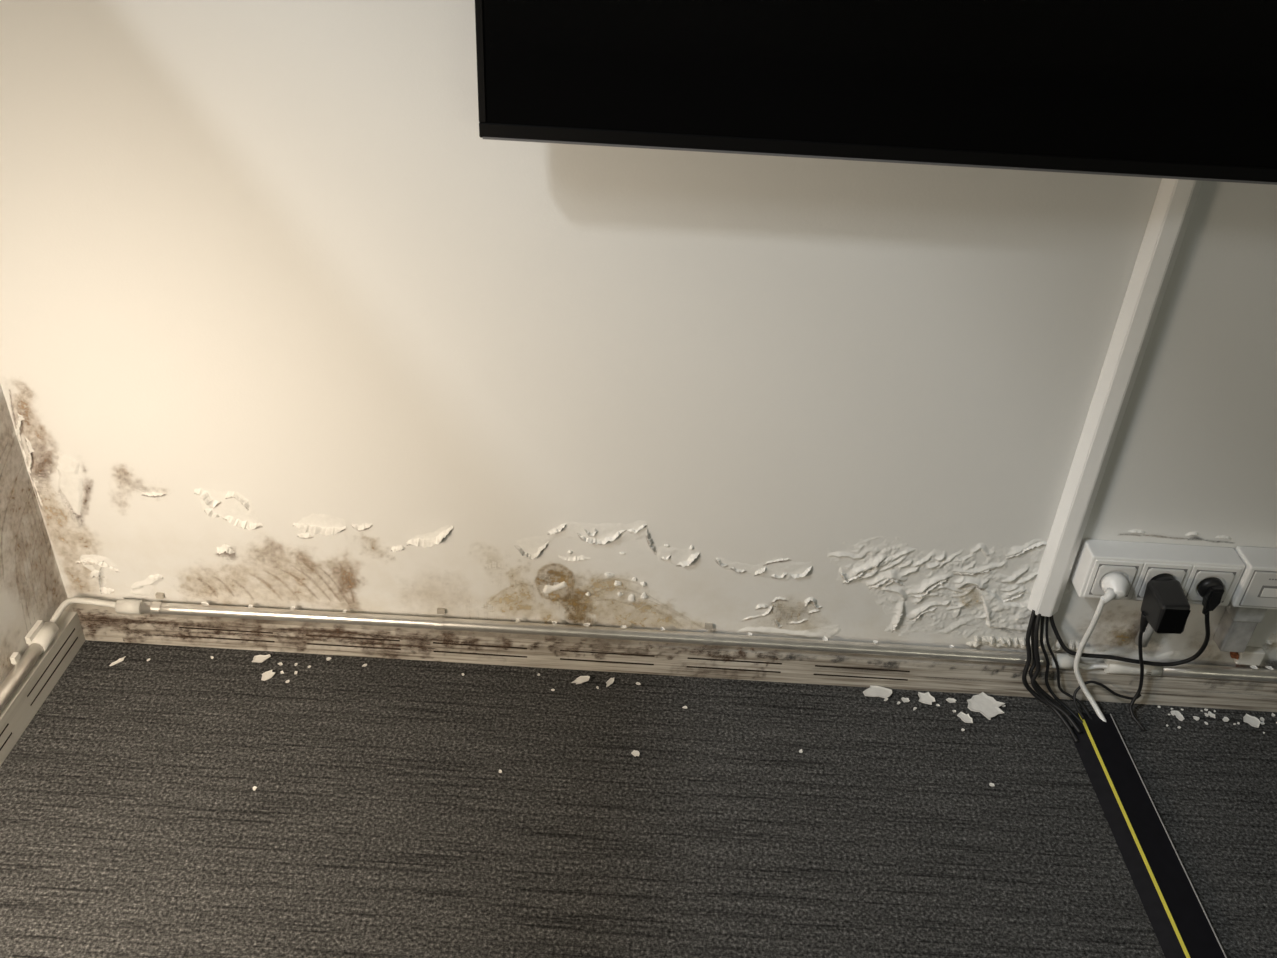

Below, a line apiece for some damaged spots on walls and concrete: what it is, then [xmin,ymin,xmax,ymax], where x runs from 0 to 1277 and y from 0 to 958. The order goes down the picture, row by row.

leakage [0,400,52,475]
peeling [56,454,90,515]
leakage [0,478,88,606]
peeling [293,513,373,538]
peeling [515,520,700,567]
peeling [716,557,812,581]
leakage [76,609,478,658]
leakage [531,638,799,671]
peeling [737,597,841,640]
spalling [965,636,1080,652]